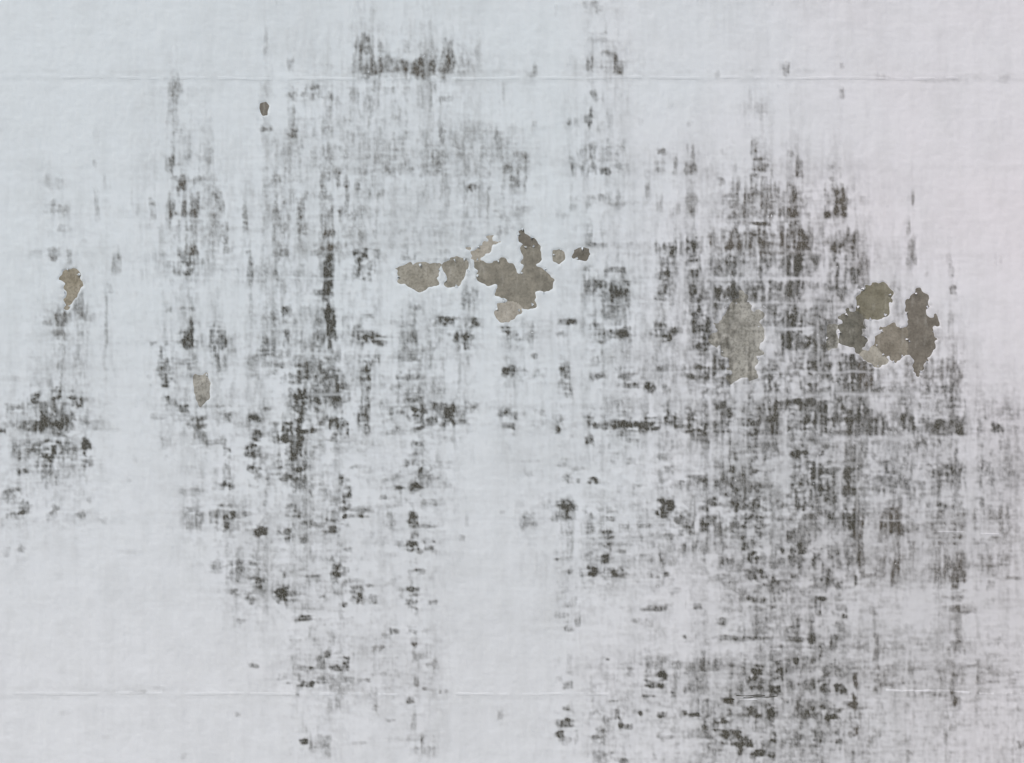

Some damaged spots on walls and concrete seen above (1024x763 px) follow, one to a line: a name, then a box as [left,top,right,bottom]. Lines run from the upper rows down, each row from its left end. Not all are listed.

peeling [259,102,269,118]
mould [14,390,91,474]
peeling [59,268,83,310]
mould [181,319,194,349]
peeling [193,373,211,407]
mould [245,407,266,470]
damp [274,230,373,486]
mould [402,397,465,454]
peeling [395,227,590,323]
peeling [708,290,765,385]
damp [585,149,966,759]
peeling [826,282,940,377]